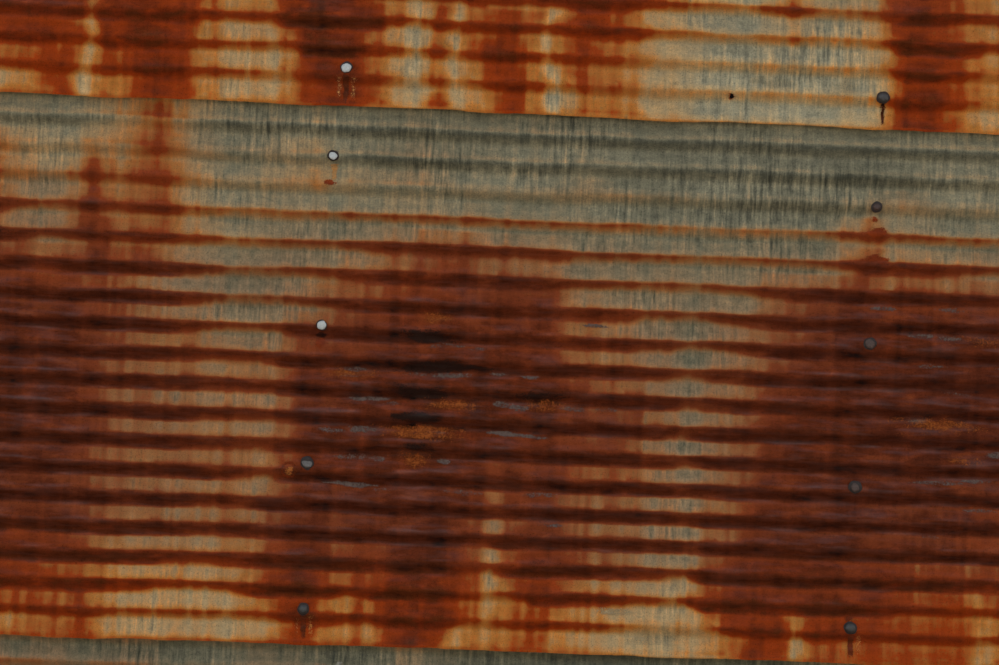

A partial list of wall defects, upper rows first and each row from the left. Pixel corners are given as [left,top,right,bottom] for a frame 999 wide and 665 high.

corrosion [866,254,890,265]